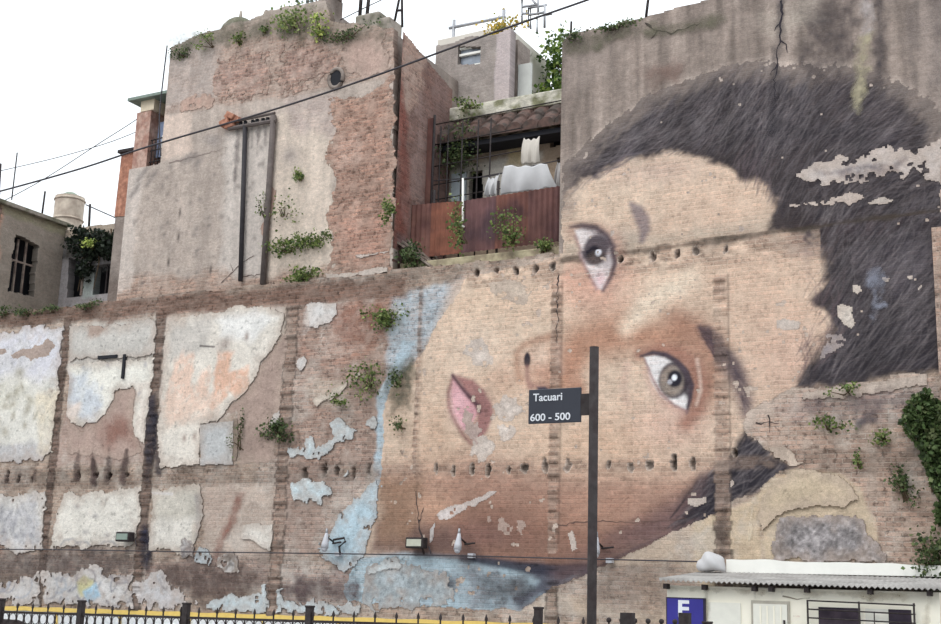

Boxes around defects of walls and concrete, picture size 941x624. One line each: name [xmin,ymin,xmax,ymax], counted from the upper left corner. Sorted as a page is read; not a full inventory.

crack [770,0,788,98]
spalling [180,30,398,278]
peeling [790,139,941,207]
peeling [0,305,307,469]
spalling [802,374,927,400]
leakage [74,449,128,485]
leakage [145,395,160,474]
peeling [287,416,378,460]
spalling [769,445,804,466]
leakage [140,526,151,568]
spalling [0,478,455,616]
spalling [771,515,887,563]